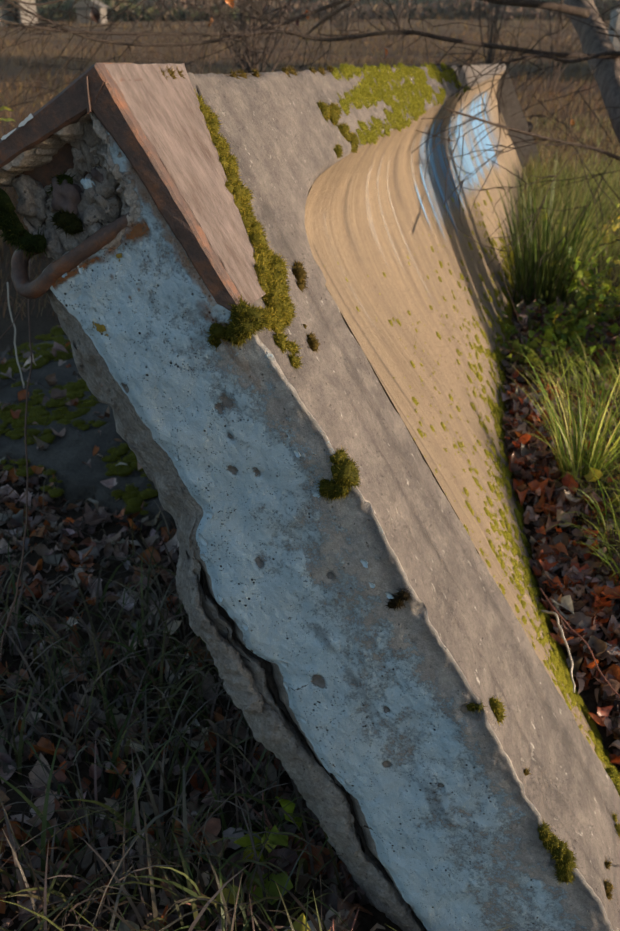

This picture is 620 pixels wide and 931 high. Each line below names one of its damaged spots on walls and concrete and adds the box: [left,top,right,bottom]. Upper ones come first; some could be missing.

spalling [0,112,138,262]
rust [52,247,115,289]
rust [125,220,150,241]
peeling [416,91,497,235]
peeling [47,130,576,931]
crack [201,567,424,926]